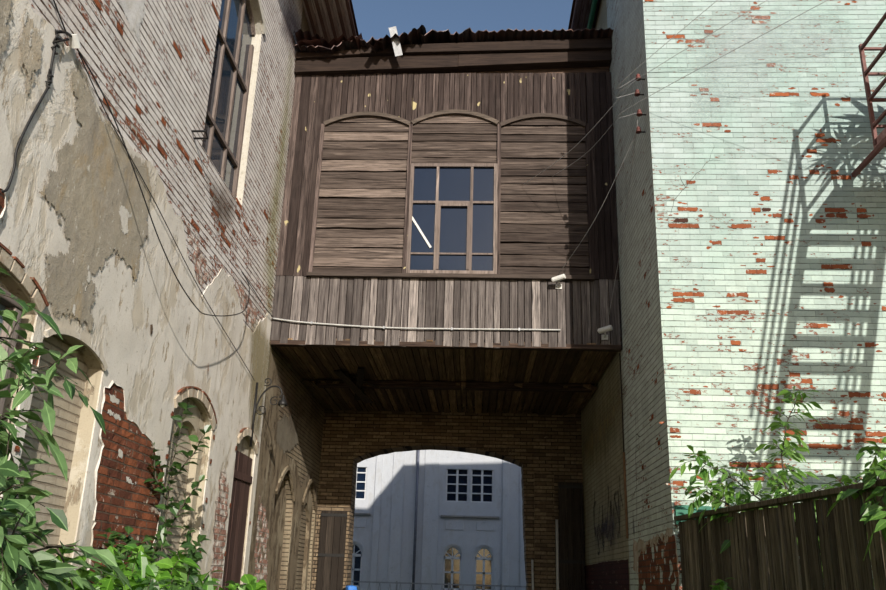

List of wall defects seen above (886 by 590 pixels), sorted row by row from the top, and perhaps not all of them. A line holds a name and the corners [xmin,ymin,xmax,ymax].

spalling [662,25,717,48]
spalling [810,88,851,106]
peeling [30,59,169,333]
spalling [156,102,252,253]
spalling [649,202,703,228]
spalling [706,191,799,279]
spalling [767,129,861,184]
spalling [666,288,704,309]
spalling [712,292,751,320]
spalling [750,372,816,393]
flaking render [90,380,170,567]
flaking render [638,533,682,590]